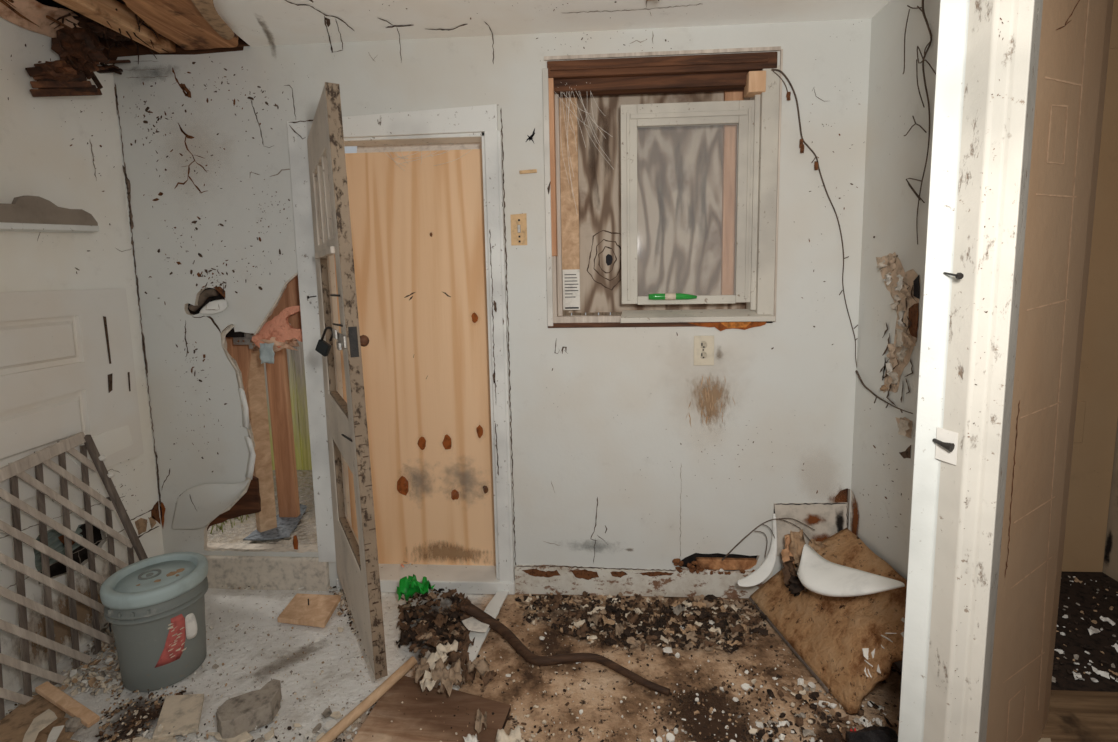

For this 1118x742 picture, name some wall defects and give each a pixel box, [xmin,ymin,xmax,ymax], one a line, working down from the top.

crack [285,0,494,64]
crack [569,0,699,44]
crack [174,123,207,193]
crack [2,61,191,589]
peeling [863,252,920,538]
spalling [522,553,757,580]